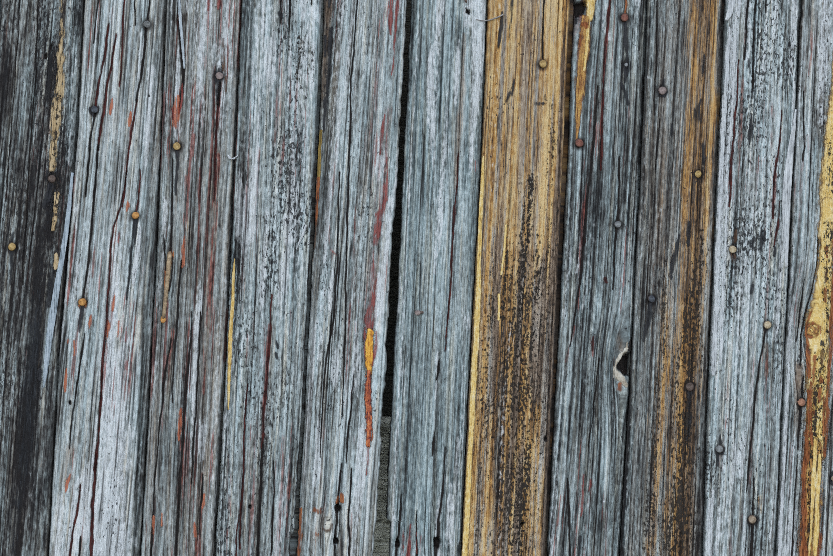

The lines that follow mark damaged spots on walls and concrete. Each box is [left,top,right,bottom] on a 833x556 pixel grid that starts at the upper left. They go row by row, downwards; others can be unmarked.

crack [177,0,185,111]
peeling [574,0,596,140]
crack [69,0,150,556]
peeling [462,155,485,556]
peeling [797,0,833,556]